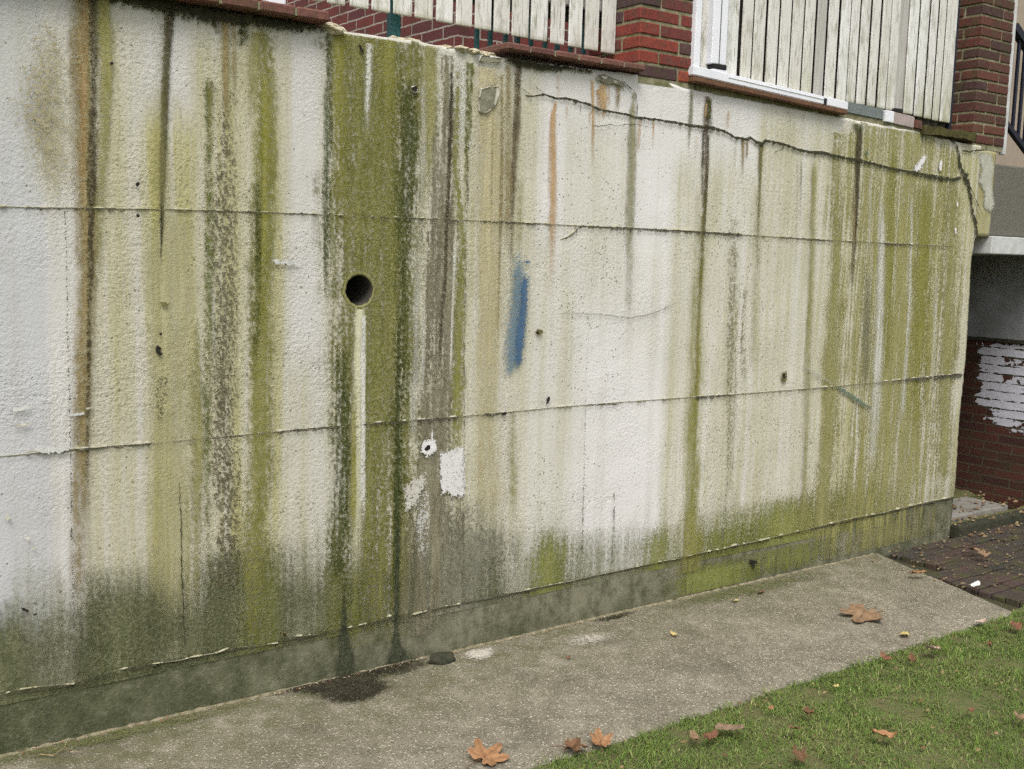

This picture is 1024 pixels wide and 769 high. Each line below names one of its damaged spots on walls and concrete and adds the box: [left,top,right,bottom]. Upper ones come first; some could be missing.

spalling [478,84,500,114]
rust [549,101,567,253]
rust [589,80,620,143]
water stain [626,92,640,267]
crack [523,79,986,242]
water stain [0,8,304,705]
water stain [282,33,522,702]
crack [0,144,948,711]
water stain [643,91,918,573]
water stain [901,190,958,479]
peeling [974,342,1024,434]
water stain [530,532,568,596]